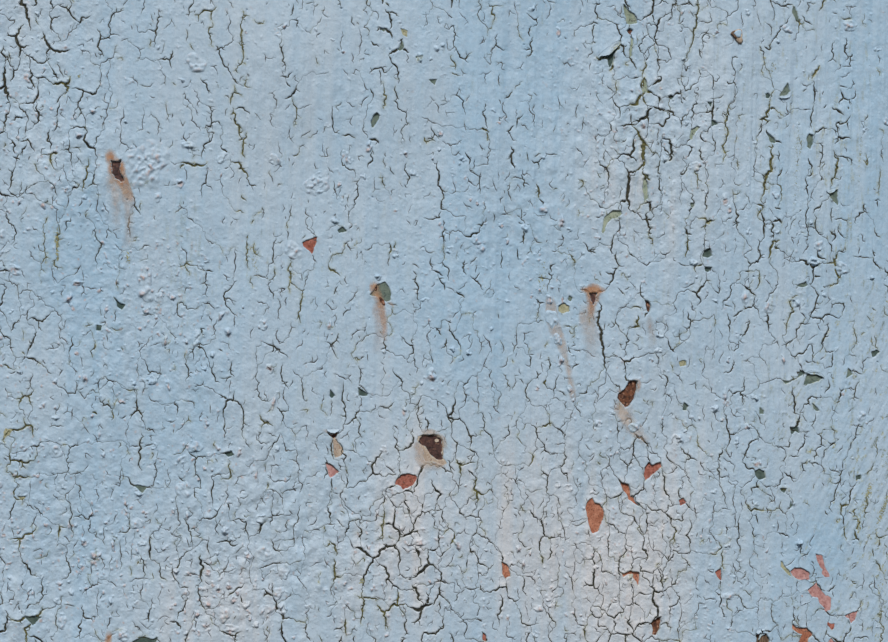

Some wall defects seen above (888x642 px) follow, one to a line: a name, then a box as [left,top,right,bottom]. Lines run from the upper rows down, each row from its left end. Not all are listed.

rust [106,152,131,195]
crack [264,0,411,324]
peeling [303,237,317,253]
crack [175,201,260,325]
rust [584,285,602,315]
peeling [618,381,636,407]
peeling [326,428,344,478]
peeling [417,435,447,465]
peeling [395,474,417,489]
peeling [644,462,661,480]
peeling [586,498,604,533]
peeling [781,554,834,642]